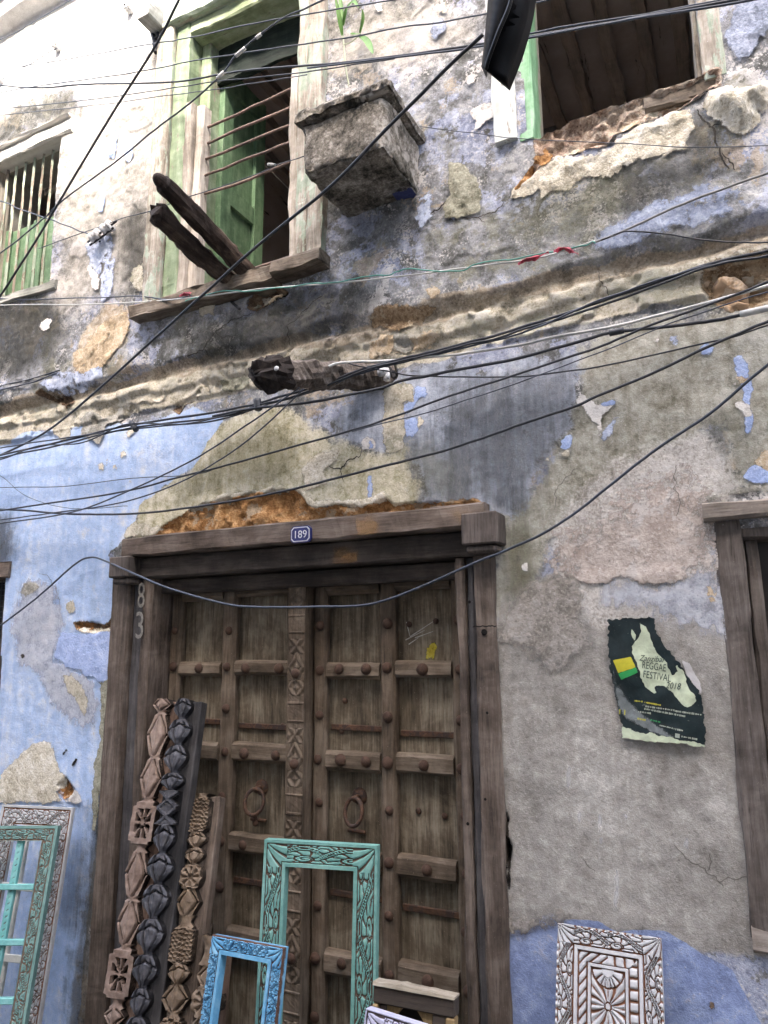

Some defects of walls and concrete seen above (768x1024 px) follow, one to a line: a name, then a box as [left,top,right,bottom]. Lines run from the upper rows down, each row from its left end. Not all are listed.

flaking render [511,67,723,199]
crack [697,109,735,170]
flaking render [393,162,483,228]
spalling [701,249,768,311]
flaking render [35,311,130,409]
flaking render [53,386,165,445]
flaking render [361,382,428,453]
peeling [576,392,617,441]
peeling [732,355,754,433]
spalling [124,449,481,538]
peeling [0,578,110,832]
crack [674,845,746,888]